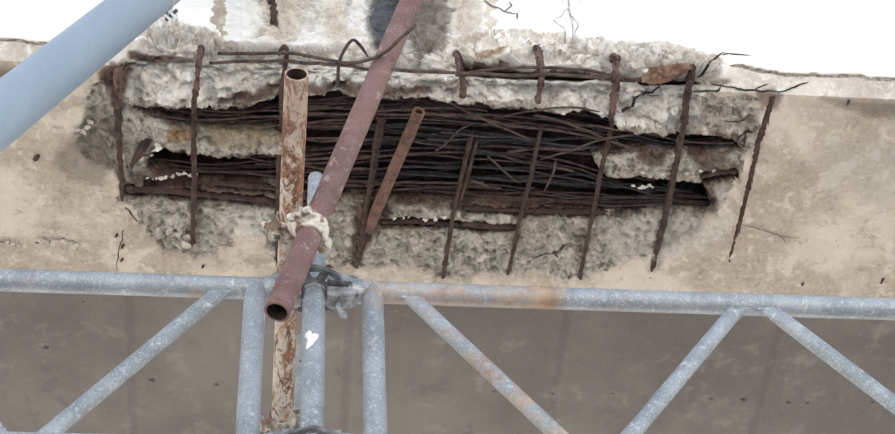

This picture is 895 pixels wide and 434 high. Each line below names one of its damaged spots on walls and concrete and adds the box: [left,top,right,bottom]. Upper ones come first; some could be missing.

corrosion [99,51,192,106]
corrosion [218,82,279,104]
corrosion [308,81,362,96]
corrosion [383,84,431,96]
crack [692,51,809,93]
corrosion [131,128,275,199]
spalling [51,0,382,260]
spalling [326,0,763,281]
corrosion [638,141,666,167]
corrosion [686,134,737,172]
crack [725,115,754,148]
corrosion [351,169,594,259]